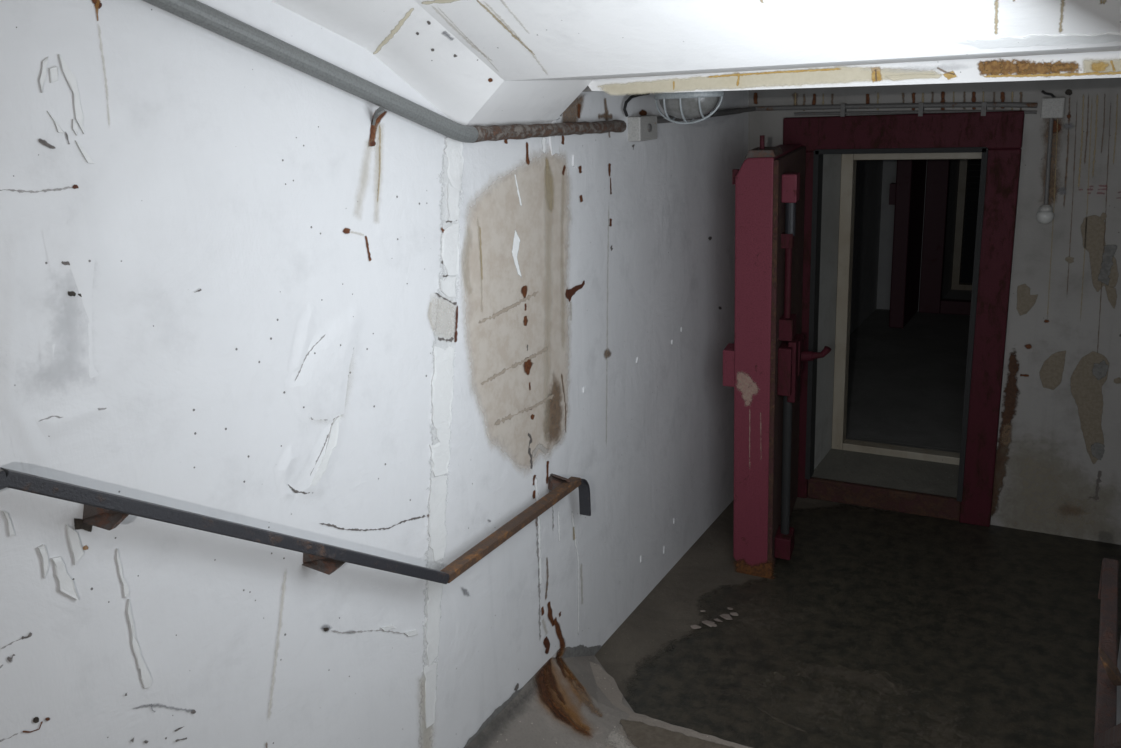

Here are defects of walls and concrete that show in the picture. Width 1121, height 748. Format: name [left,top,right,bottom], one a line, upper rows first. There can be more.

rust [978,59,1121,78]
rust [560,96,583,145]
crack [0,185,78,193]
peeling [1081,213,1119,308]
peeling [322,137,464,748]
rust [991,344,1032,515]
peeling [1039,351,1121,464]
crack [320,514,429,531]
crack [0,632,32,668]
crack [0,717,50,742]
peeling [464,645,602,748]
rust [537,559,602,735]